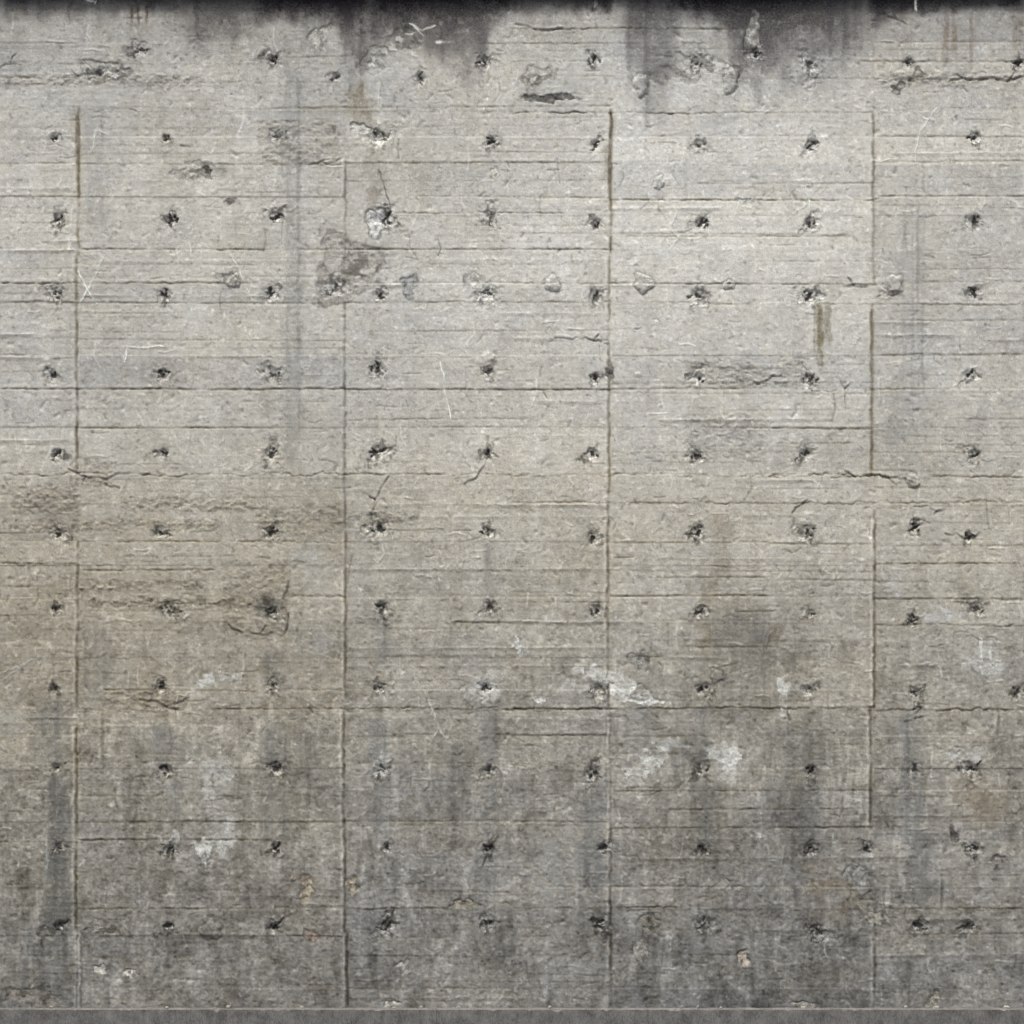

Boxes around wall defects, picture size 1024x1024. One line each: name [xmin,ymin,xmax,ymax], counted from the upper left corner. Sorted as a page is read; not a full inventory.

leakage [187,0,509,59]
leakage [540,0,612,12]
leakage [632,0,846,63]
leakage [873,0,1020,16]
spalling [520,65,573,104]
spalling [319,209,395,306]
corrosion [817,304,828,350]
leakage [563,663,671,706]
leakage [468,674,500,757]
leakage [622,737,690,779]
leakage [707,741,742,781]
leakage [194,817,240,866]